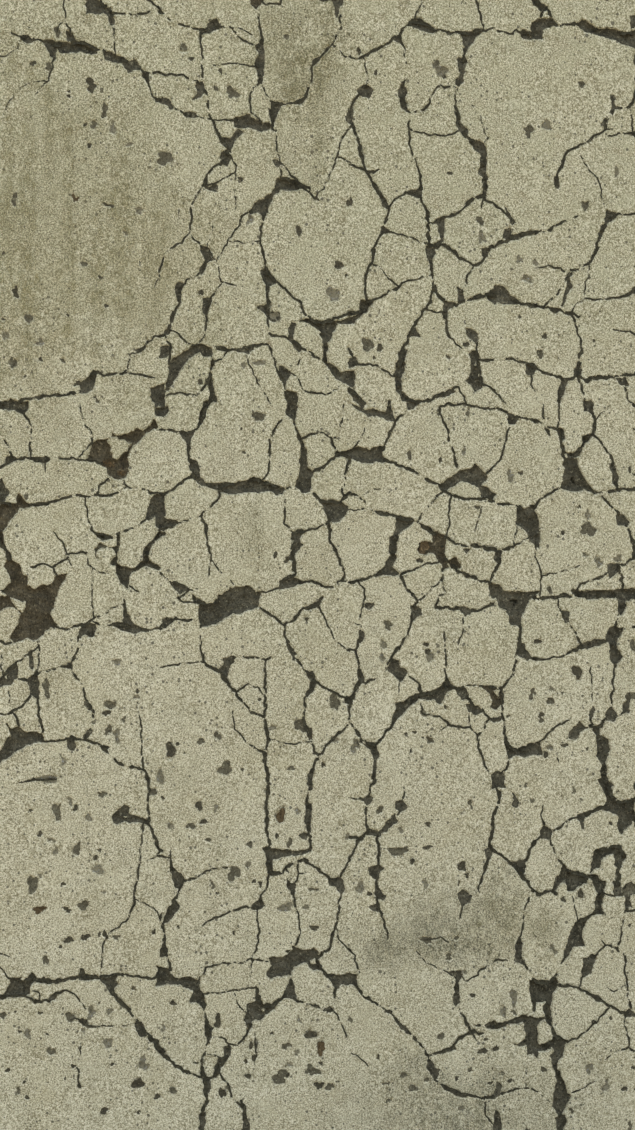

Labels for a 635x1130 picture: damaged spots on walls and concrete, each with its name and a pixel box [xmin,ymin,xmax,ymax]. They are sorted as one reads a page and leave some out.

crack [0,691,228,1010]
crack [70,766,553,1130]
crack [416,767,635,1060]
crack [558,1071,595,1093]